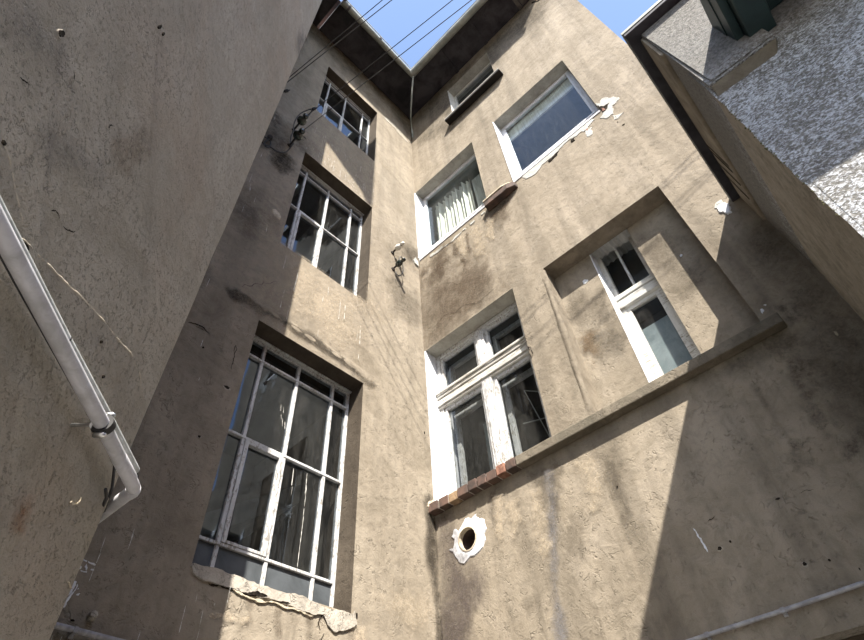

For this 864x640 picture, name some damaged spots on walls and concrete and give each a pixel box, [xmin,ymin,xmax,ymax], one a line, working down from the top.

spalling [522,97,625,179]
damp [496,495,518,537]
spalling [190,563,358,633]
damp [426,495,481,640]